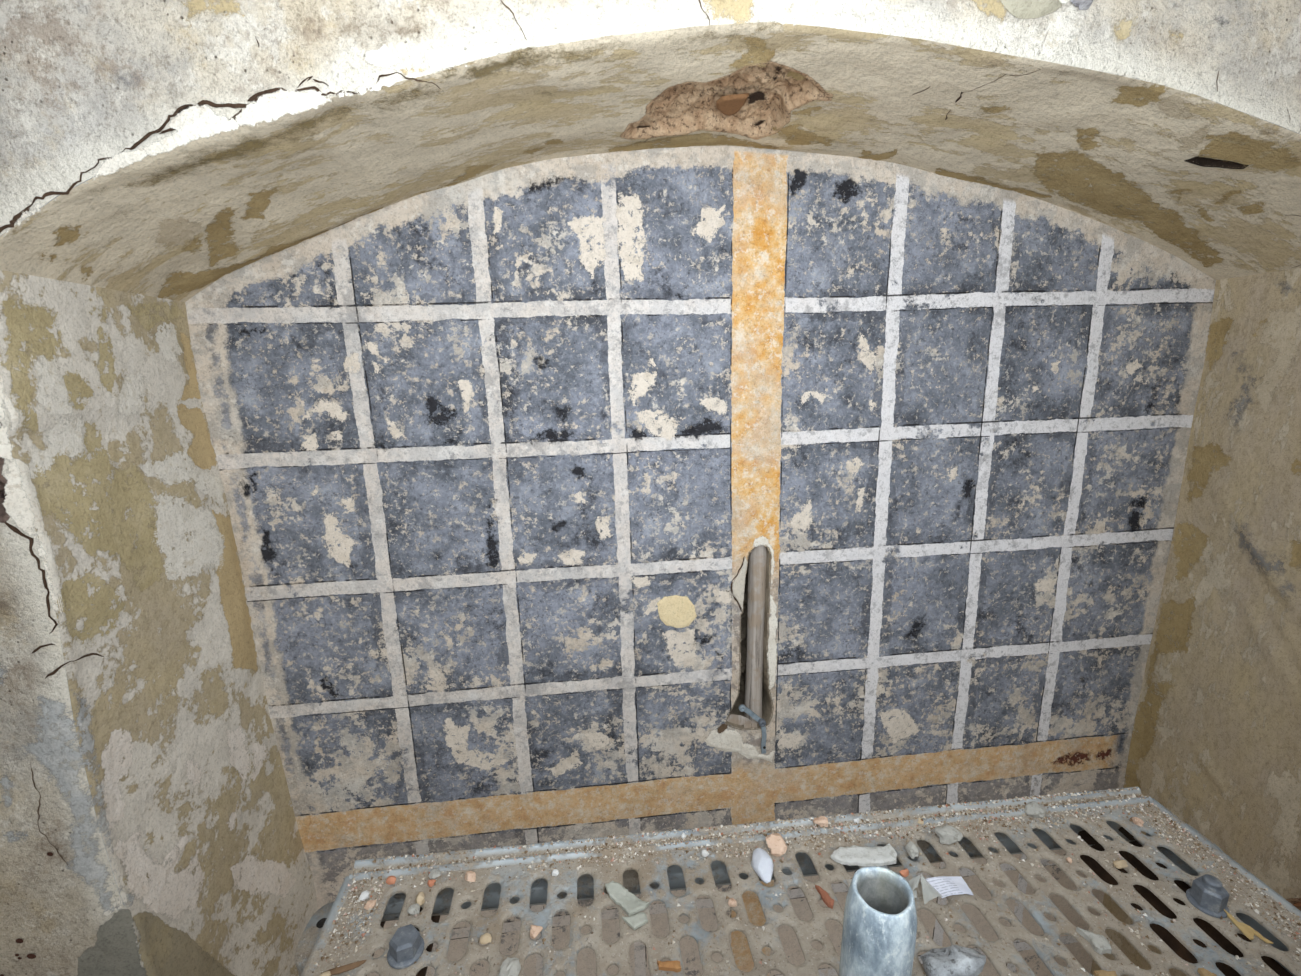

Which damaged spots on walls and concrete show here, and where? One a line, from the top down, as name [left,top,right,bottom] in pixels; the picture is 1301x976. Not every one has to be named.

crack [0,72,440,233]
flaking render [85,44,467,183]
flaking render [608,36,835,153]
peeling [934,127,1265,268]
peeling [1176,126,1301,172]
peeling [0,187,389,673]
peeling [457,380,475,418]
crack [3,521,104,679]
peeling [662,628,697,670]
flaking render [713,536,778,689]
peeling [442,717,510,771]
flaking render [695,724,804,762]